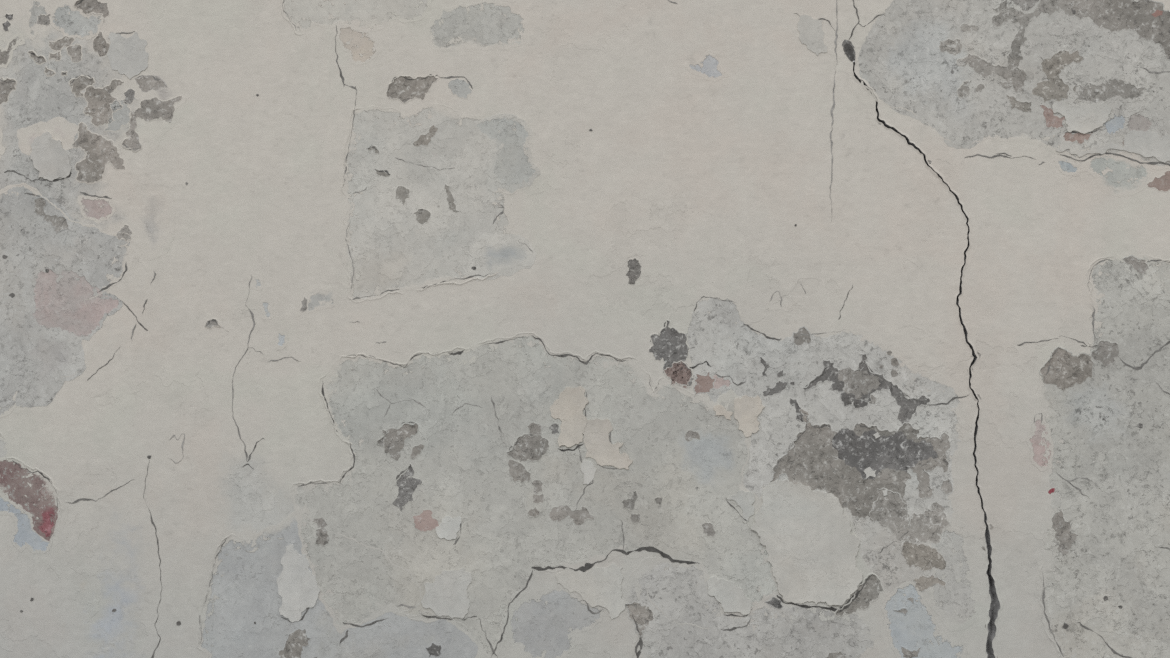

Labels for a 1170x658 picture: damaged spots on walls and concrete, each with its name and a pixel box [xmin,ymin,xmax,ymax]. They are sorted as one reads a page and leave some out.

peeling [0,0,183,279]
peeling [299,74,541,314]
peeling [427,0,528,52]
peeling [857,0,1170,198]
crack [66,433,185,658]
crack [232,275,297,469]
peeling [196,293,963,658]
crack [480,521,698,658]
crack [796,0,1170,658]
peeling [1037,254,1170,658]